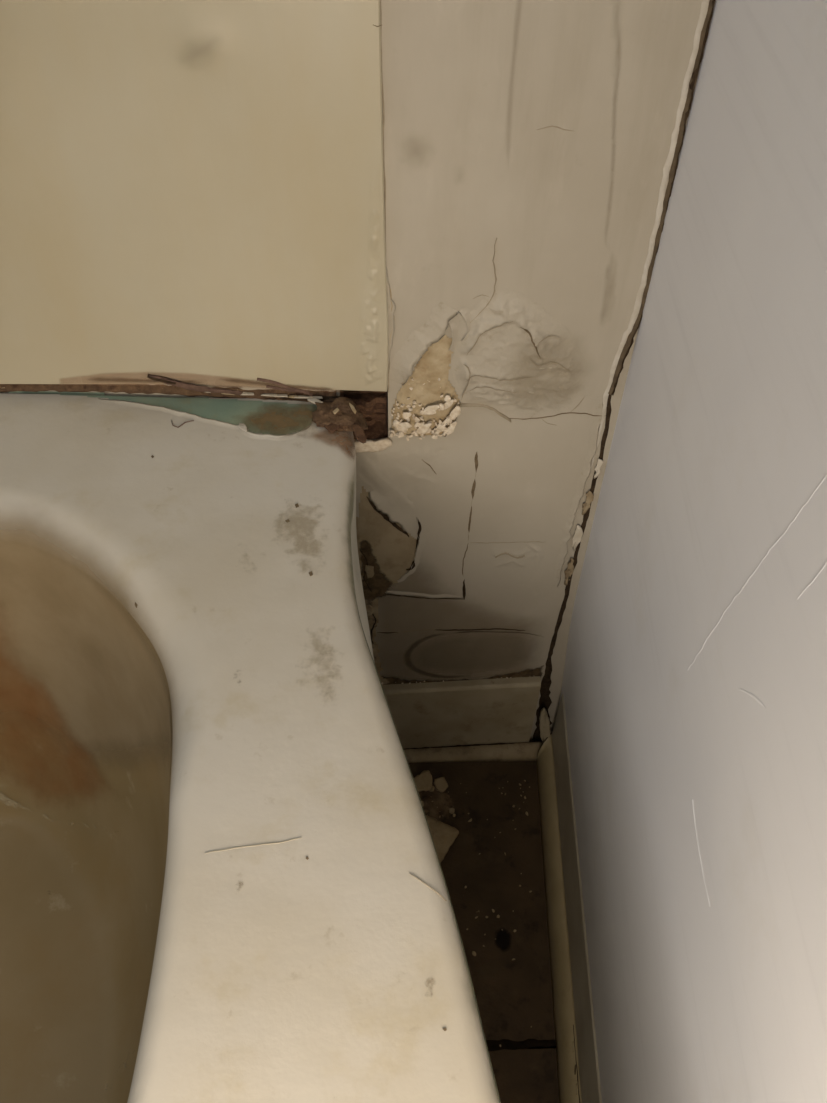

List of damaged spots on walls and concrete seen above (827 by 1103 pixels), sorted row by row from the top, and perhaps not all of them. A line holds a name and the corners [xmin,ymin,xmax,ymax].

flaking render [340,268,471,441]
crack [460,0,715,741]
peeling [356,486,428,685]
crack [377,627,525,635]
crack [383,452,539,600]